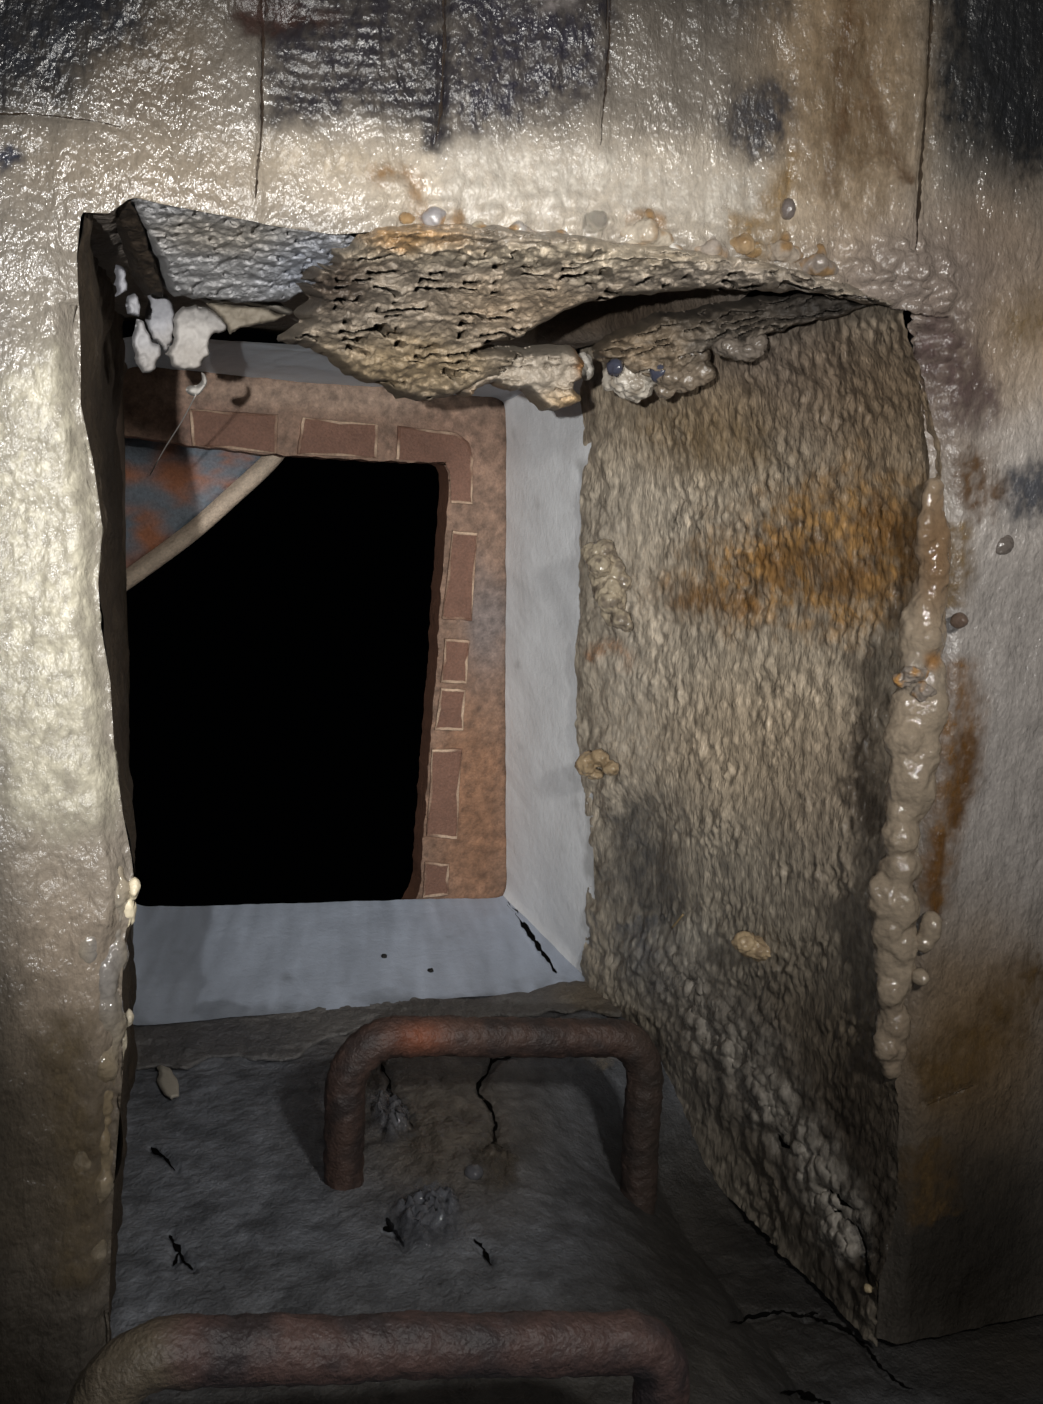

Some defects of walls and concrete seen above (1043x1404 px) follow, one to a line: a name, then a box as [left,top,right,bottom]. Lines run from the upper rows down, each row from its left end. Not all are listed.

damp [808,0,910,208]
damp [268,0,894,411]
damp [913,316,996,415]
corrosion [679,471,918,630]
damp [846,477,952,1079]
crack [476,1056,511,1152]
crack [778,1134,790,1149]
crack [827,1189,870,1283]
crack [781,1389,831,1404]
crack [730,1310,914,1390]